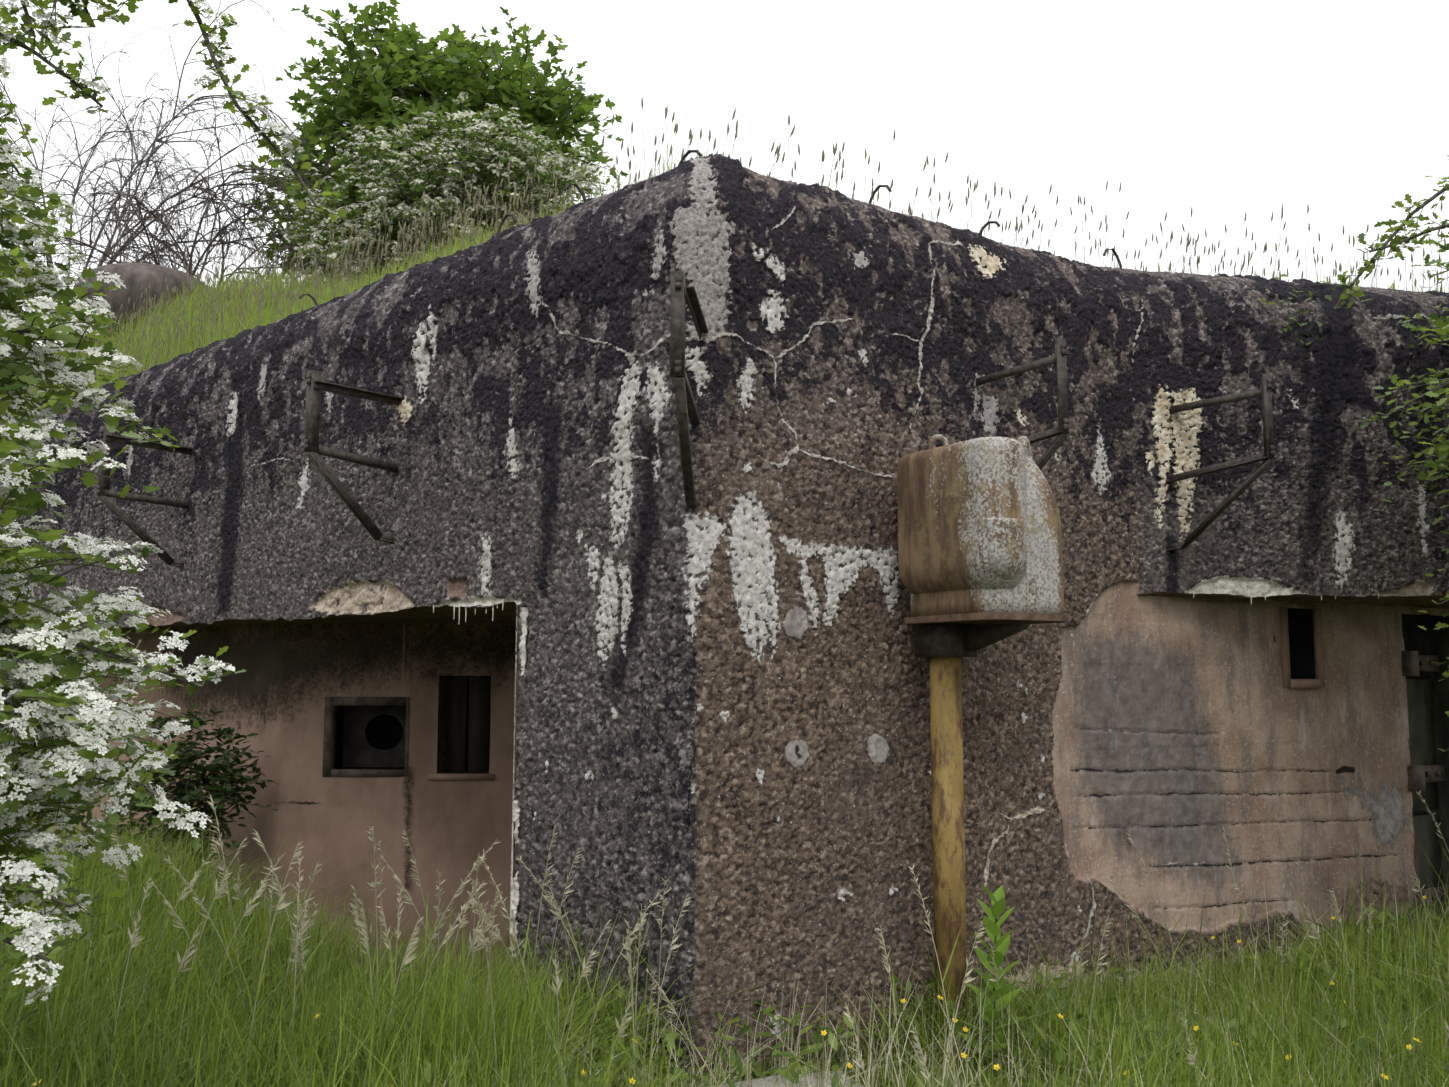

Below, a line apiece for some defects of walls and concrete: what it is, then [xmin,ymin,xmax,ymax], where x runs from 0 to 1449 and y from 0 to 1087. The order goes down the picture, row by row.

crack [542,298,897,477]
crack [893,240,977,441]
water stain [534,397,563,596]
water stain [576,355,672,719]
efflorescence [681,490,900,662]
water stain [1145,384,1203,593]
spalling [1185,575,1302,597]
spalling [1363,579,1434,596]
spalling [308,578,529,959]
spalling [1335,877,1410,927]